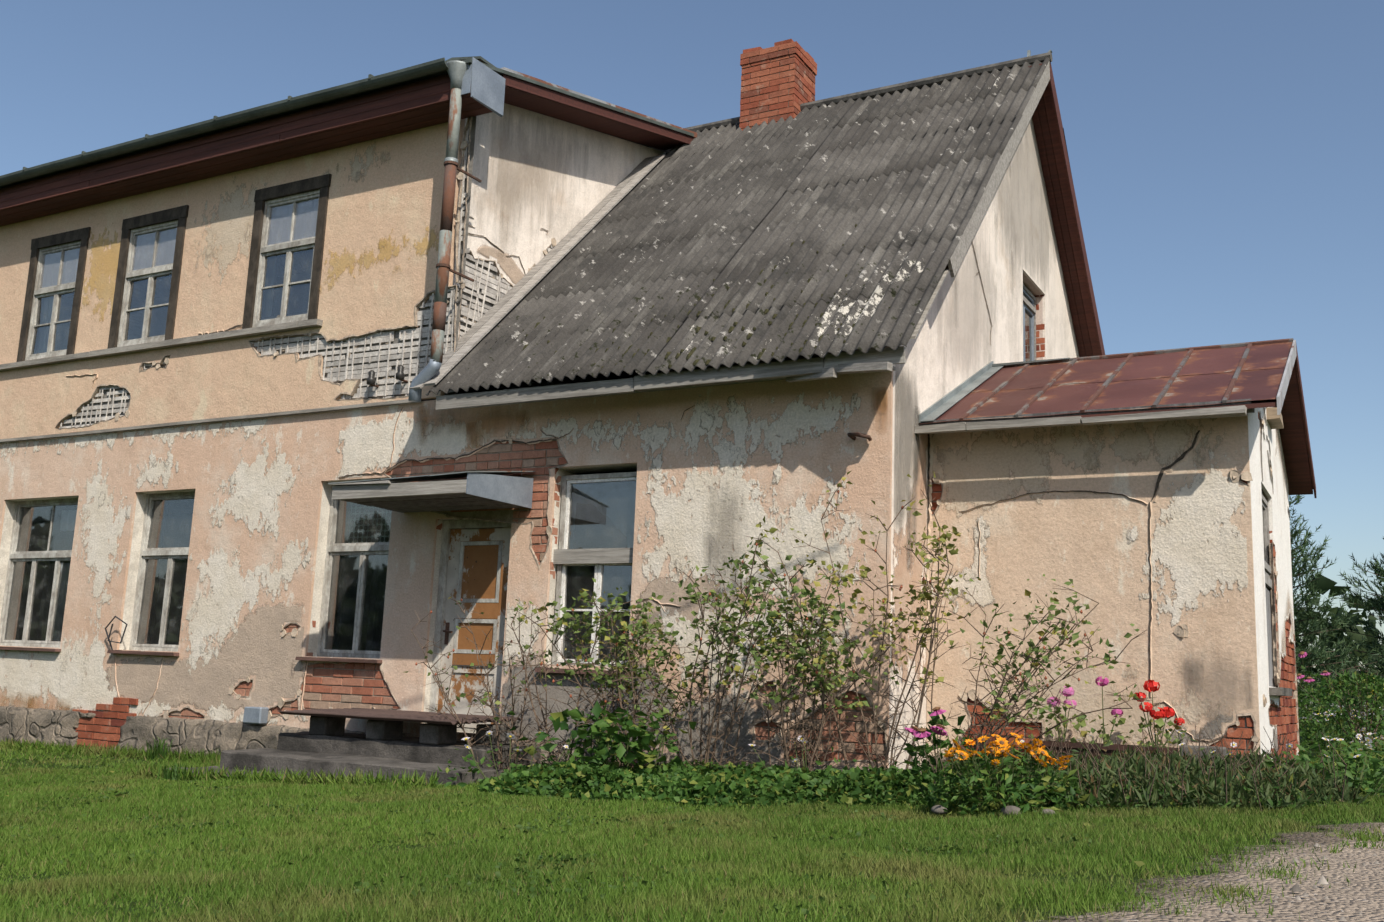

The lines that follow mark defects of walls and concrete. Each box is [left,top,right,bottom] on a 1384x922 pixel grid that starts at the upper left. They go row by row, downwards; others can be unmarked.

spalling [139,355,170,373]
flaking render [0,384,401,749]
peeling [249,116,1300,765]
crack [927,430,1226,743]